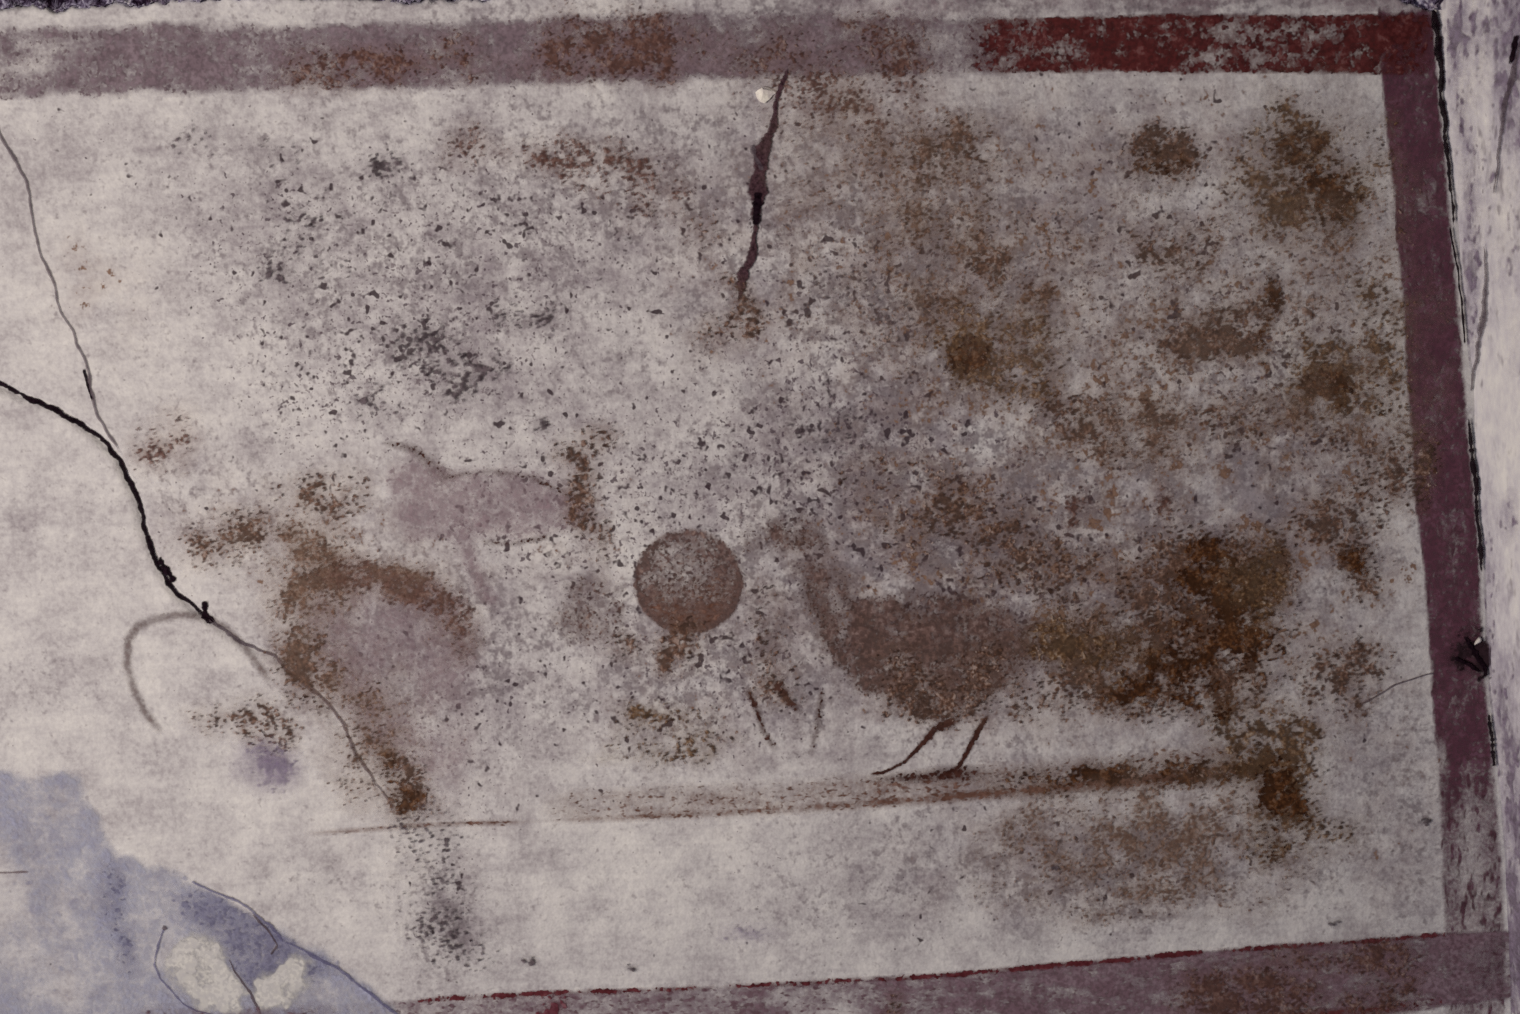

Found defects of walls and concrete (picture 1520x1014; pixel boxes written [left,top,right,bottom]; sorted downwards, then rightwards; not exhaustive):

spalling [0,0,203,13]
spalling [1401,0,1443,11]
water stain [778,89,1495,483]
crack [0,134,392,810]
water stain [973,764,1317,927]